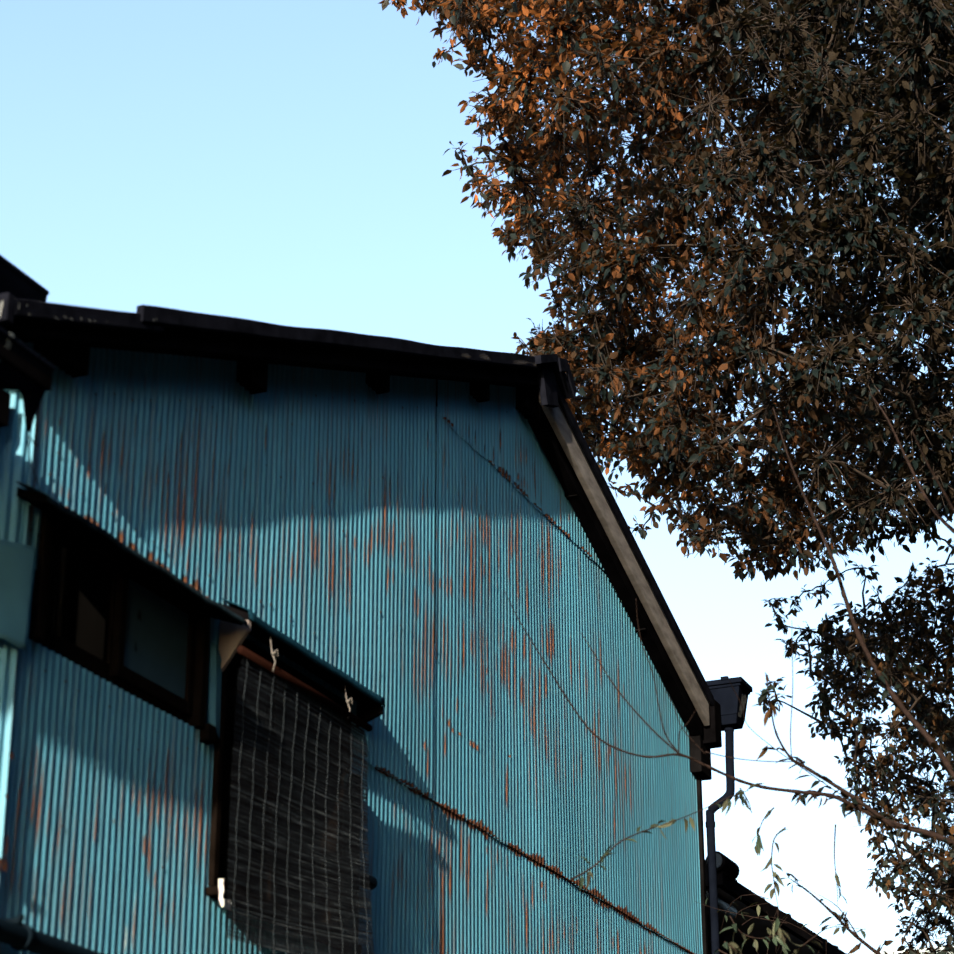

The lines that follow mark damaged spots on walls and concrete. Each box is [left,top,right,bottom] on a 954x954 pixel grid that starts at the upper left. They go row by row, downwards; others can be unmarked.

corrosion [33,405,47,487]
corrosion [71,412,257,597]
corrosion [271,420,570,716]
corrosion [0,649,61,930]
corrosion [60,822,75,928]
corrosion [113,747,209,924]
corrosion [442,697,478,752]
corrosion [501,619,565,767]
corrosion [374,765,696,954]
corrosion [570,642,631,811]